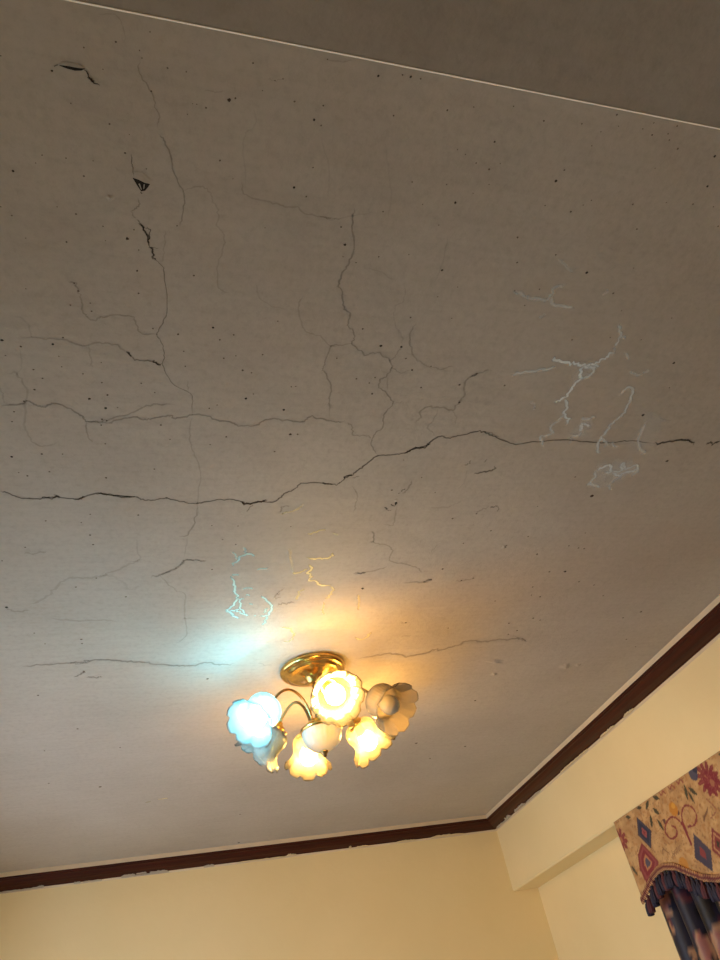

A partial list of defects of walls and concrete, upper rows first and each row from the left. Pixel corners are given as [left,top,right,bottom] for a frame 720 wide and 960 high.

peeling [54,62,99,85]
peeling [131,158,151,194]
crack [139,224,156,259]
water stain [552,337,620,431]
crack [4,430,720,508]